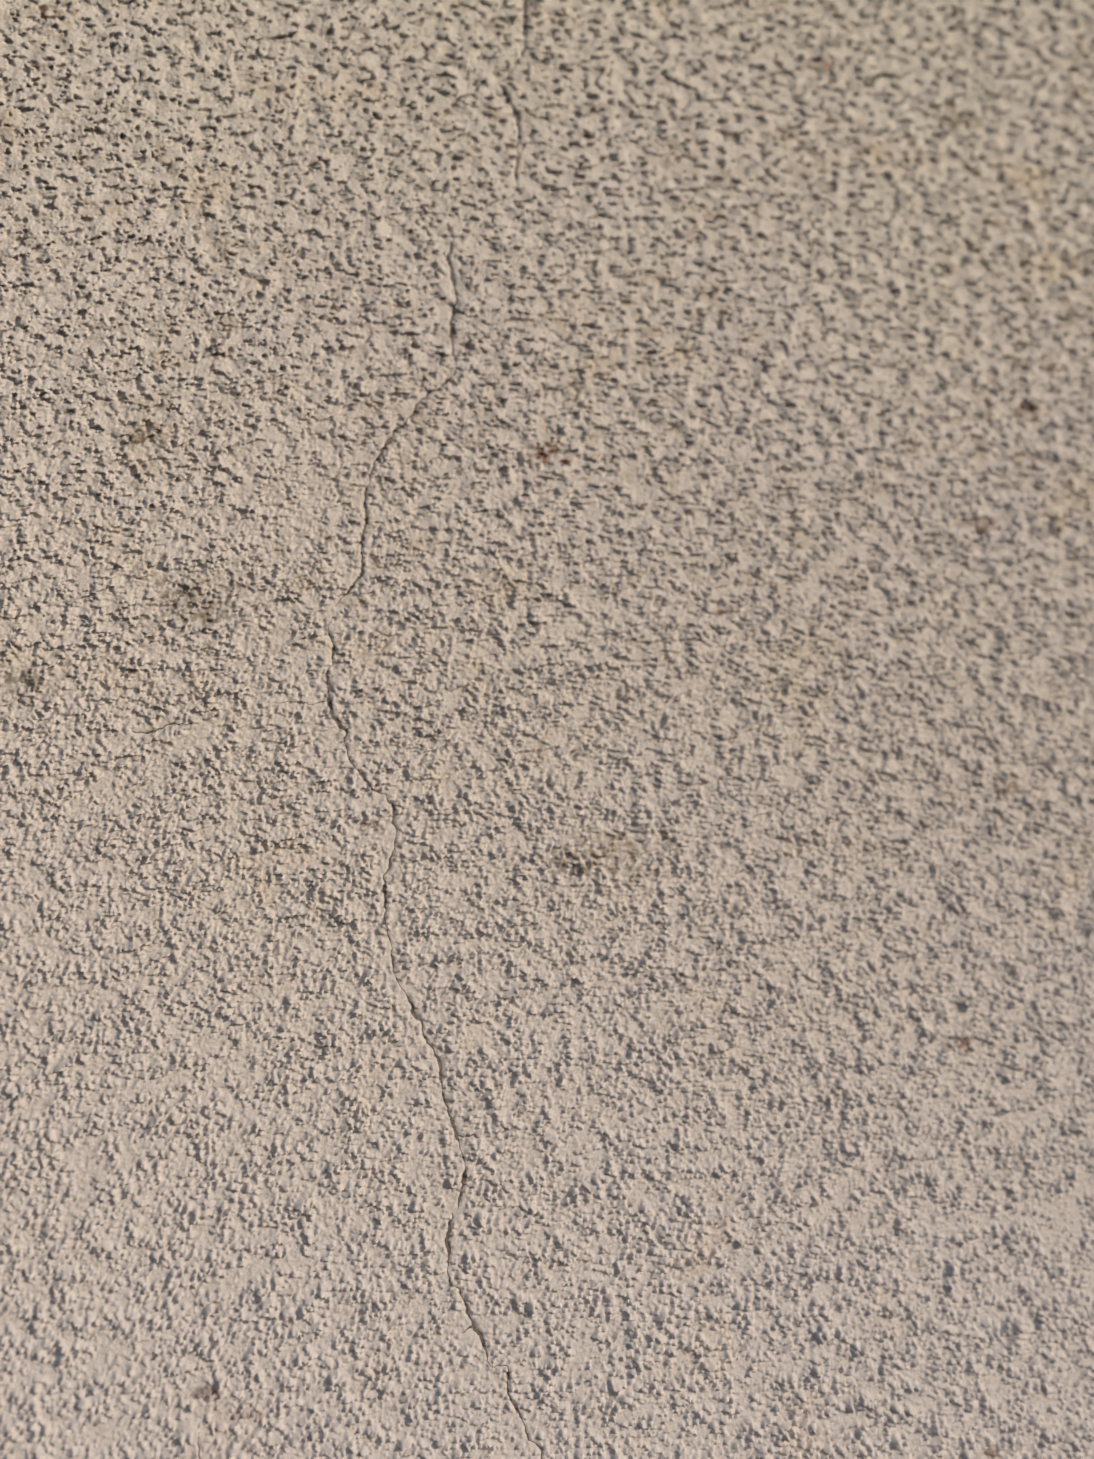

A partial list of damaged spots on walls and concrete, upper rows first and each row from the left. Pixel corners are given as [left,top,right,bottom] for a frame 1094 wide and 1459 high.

crack [483,0,528,211]
crack [278,239,543,1459]